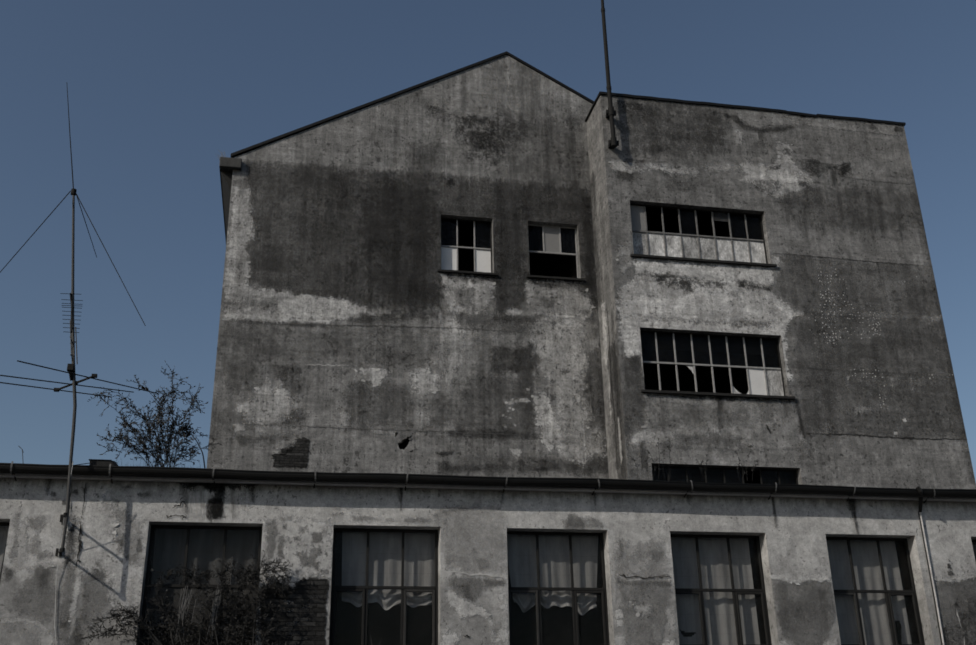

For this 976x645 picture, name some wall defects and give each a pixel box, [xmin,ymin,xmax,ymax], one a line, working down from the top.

peeling [223,186,400,326]
peeling [355,366,392,387]
peeling [409,274,496,396]
peeling [233,377,310,470]
spalling [373,409,430,452]
leakage [180,482,259,519]
flaking render [258,513,432,645]
leakage [775,580,835,645]